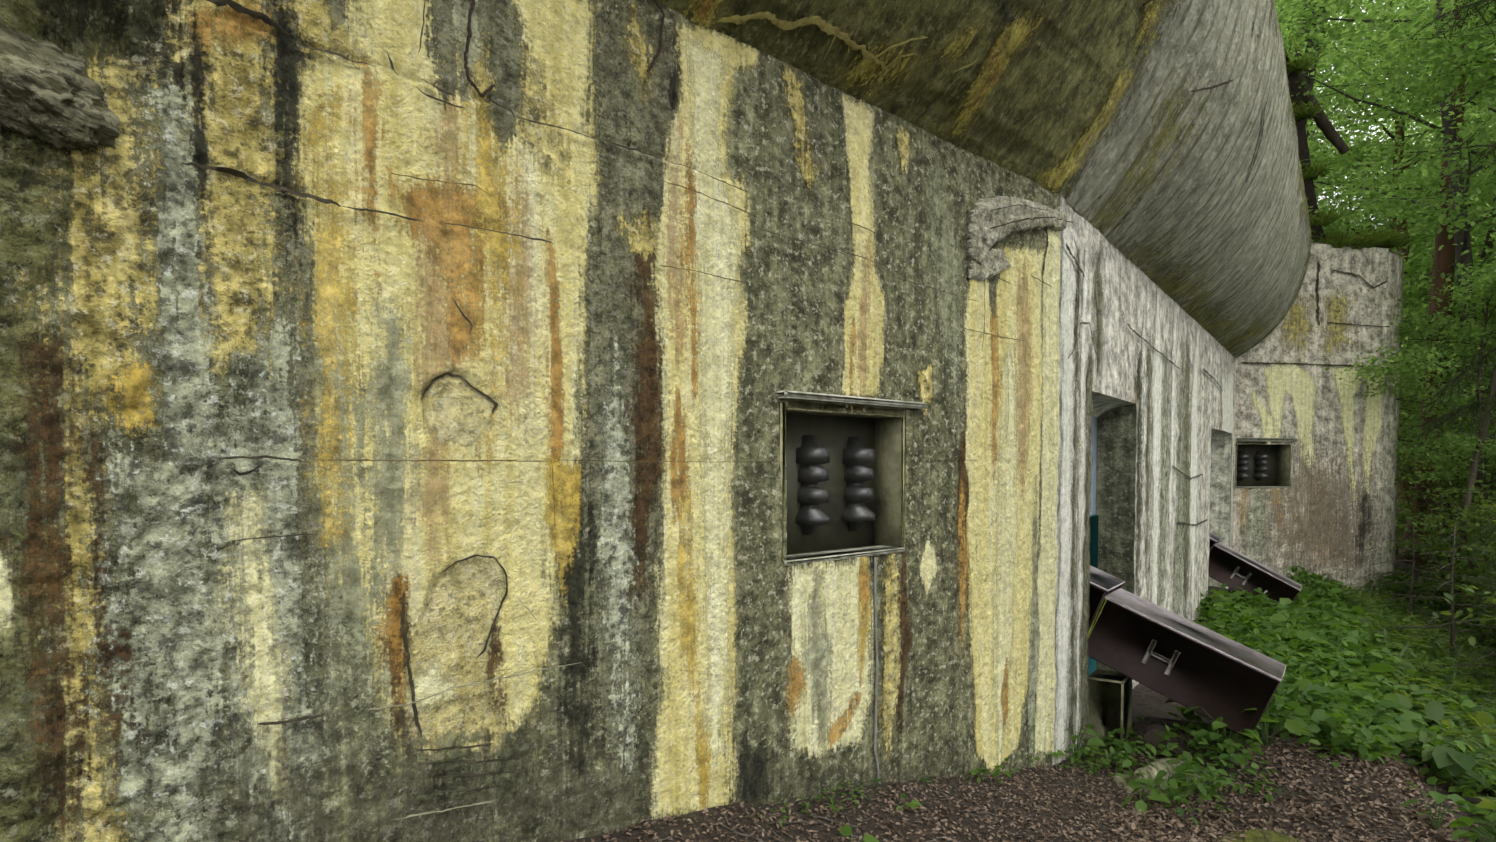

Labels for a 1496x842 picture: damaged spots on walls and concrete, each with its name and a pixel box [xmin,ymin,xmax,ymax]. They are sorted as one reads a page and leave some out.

leakage [17,0,971,842]
crack [182,0,1099,439]
leakage [928,0,1386,773]
crack [1190,80,1233,92]
crack [1127,324,1383,391]
crack [1246,101,1267,182]
crack [1316,262,1390,327]
corrosion [0,334,176,835]
corrosion [376,575,507,761]
crack [1178,518,1208,526]